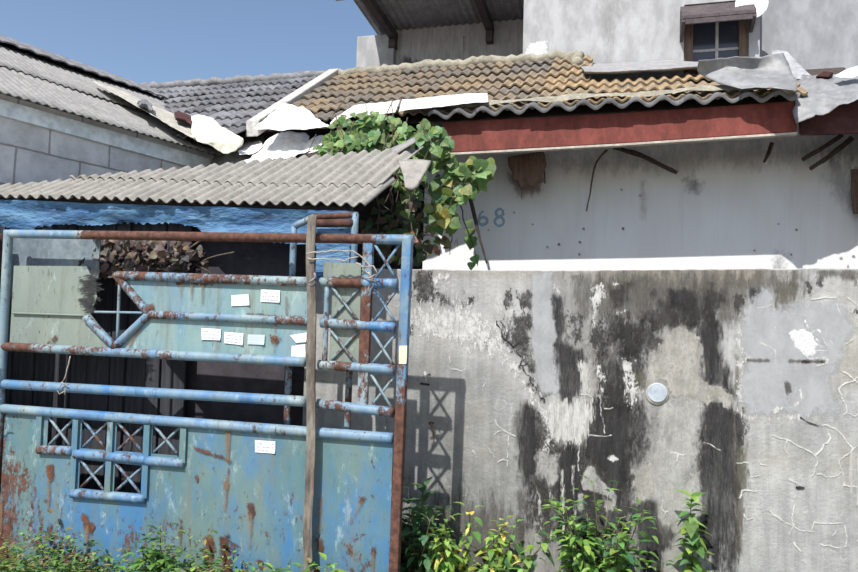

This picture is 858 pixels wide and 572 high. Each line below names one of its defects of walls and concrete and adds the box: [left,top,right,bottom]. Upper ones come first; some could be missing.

corrosion [46,465,54,508]
corrosion [81,513,95,550]
corrosion [193,431,231,507]
corrosion [203,534,238,572]
corrosion [246,503,255,534]
leakage [402,270,857,572]
spalling [630,326,742,522]
crack [737,371,858,552]